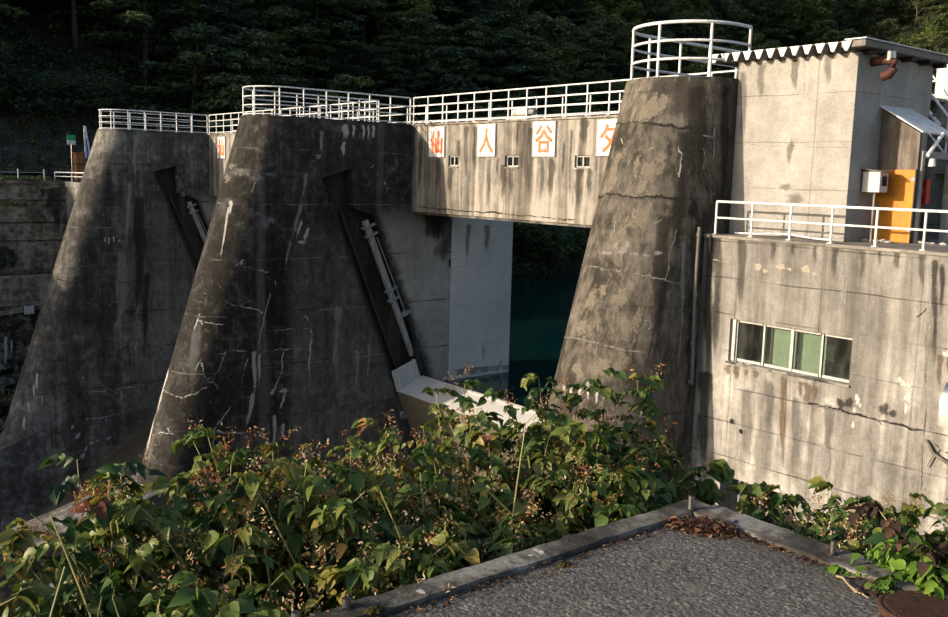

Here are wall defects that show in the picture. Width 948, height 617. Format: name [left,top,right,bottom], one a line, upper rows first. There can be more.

damp [341,124,375,155]
damp [104,135,150,349]
damp [285,173,310,262]
crack [565,120,717,355]
spalling [755,263,818,276]
damp [928,260,945,340]
crack [80,260,313,458]
damp [246,351,261,424]
damp [270,388,289,444]
damp [697,237,721,454]
crack [808,402,948,485]